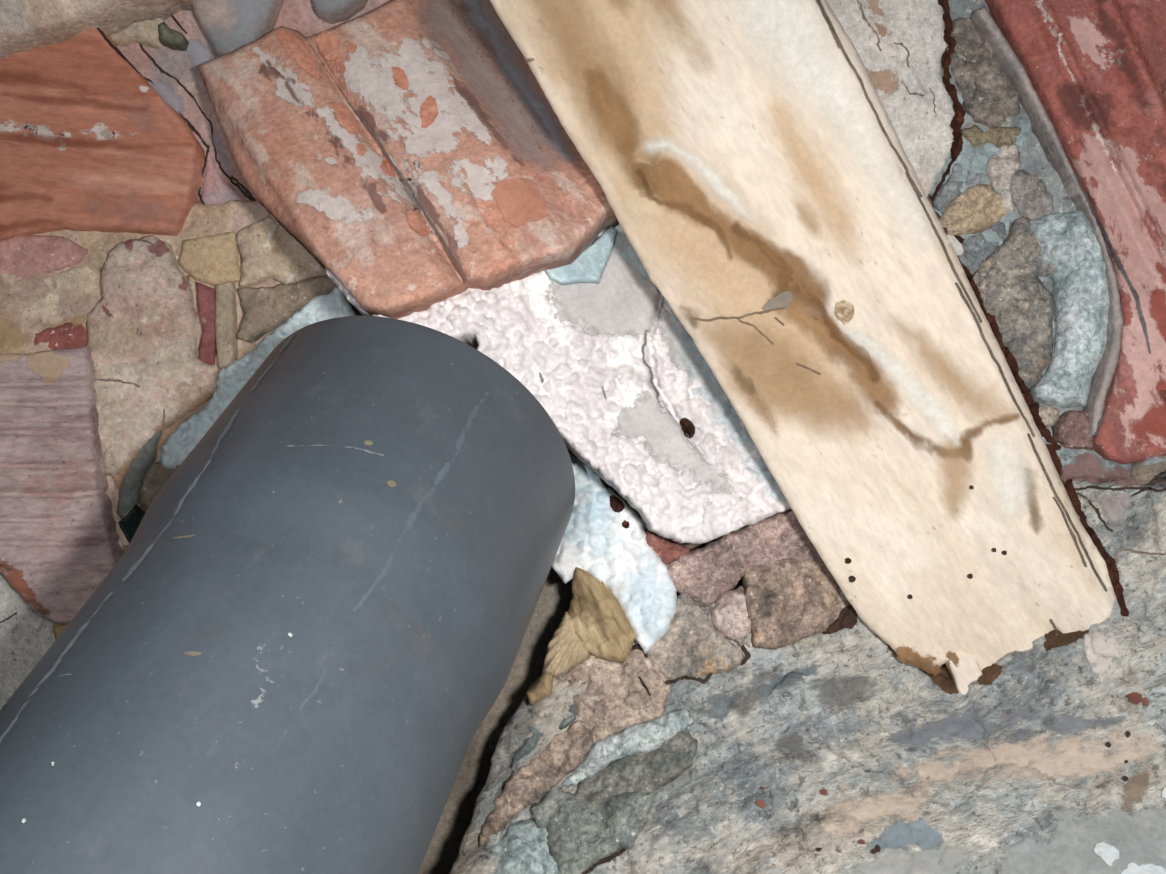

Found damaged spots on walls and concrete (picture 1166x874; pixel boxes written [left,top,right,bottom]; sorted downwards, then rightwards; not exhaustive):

peeling [252,30,549,249]
peeling [546,226,617,286]
damp [528,0,1018,501]
peeling [1150,262,1166,341]
peeling [1156,381,1166,403]
damp [991,442,1023,513]